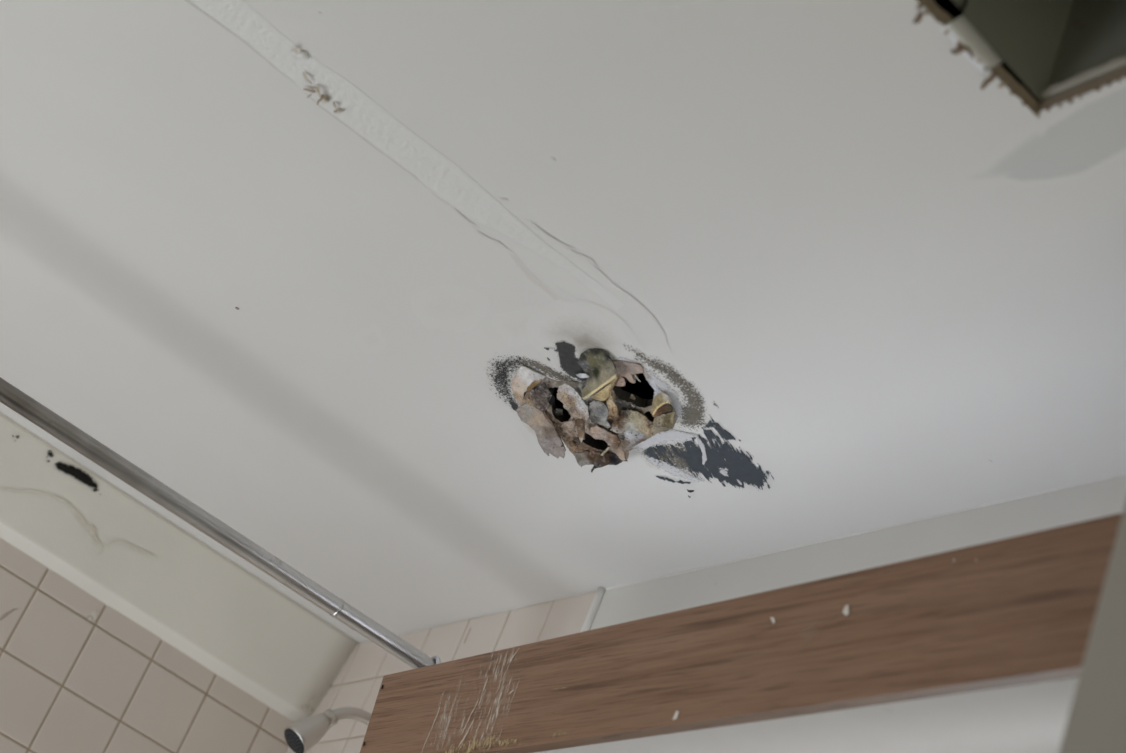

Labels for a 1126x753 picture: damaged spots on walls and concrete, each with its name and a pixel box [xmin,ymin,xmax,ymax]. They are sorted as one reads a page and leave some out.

water stain [46,450,101,495]
spalling [511,349,742,485]